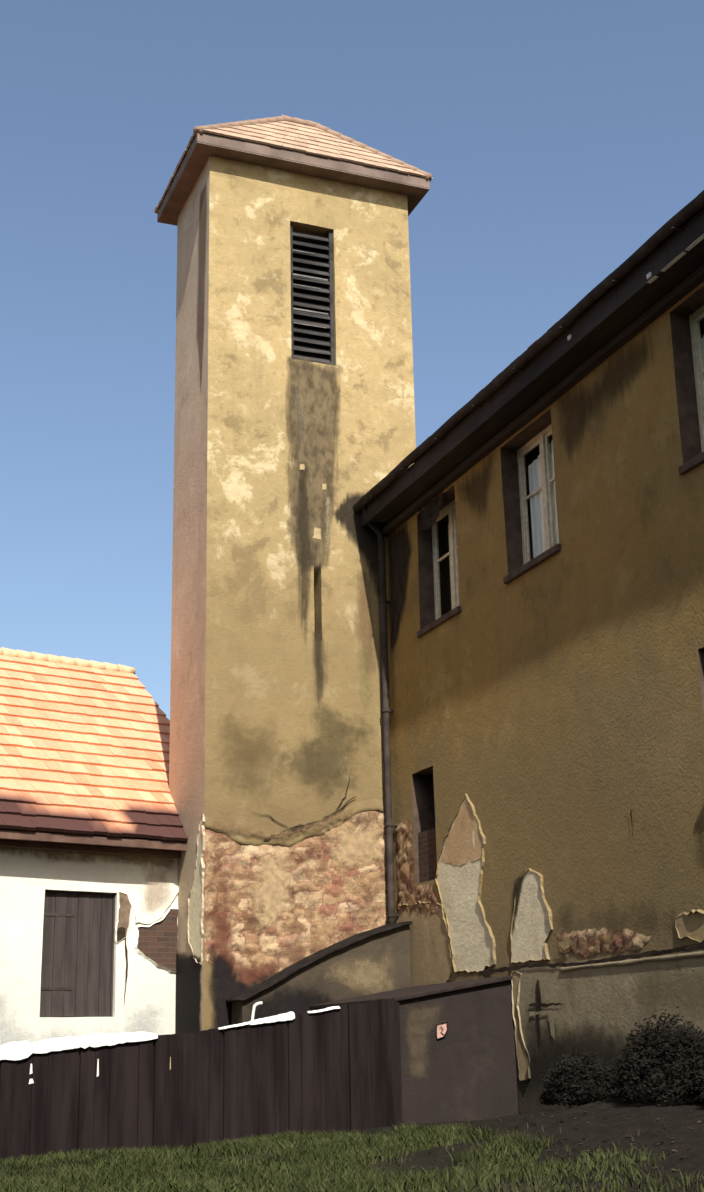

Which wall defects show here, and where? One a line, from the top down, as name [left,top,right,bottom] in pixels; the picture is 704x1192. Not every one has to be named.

damp [299,470,310,620]
damp [326,498,355,548]
damp [315,632,323,696]
crack [253,773,356,840]
spalling [115,793,496,1003]
spalling [675,909,704,943]
flaking render [510,868,652,1081]
spalling [435,1020,448,1040]